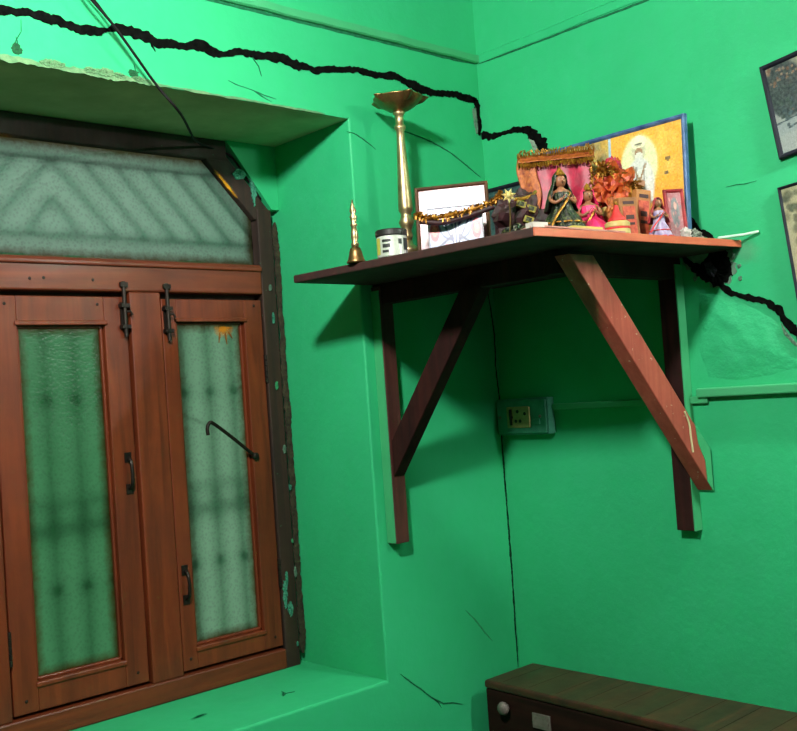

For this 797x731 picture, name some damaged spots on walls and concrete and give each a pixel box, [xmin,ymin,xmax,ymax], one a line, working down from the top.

crack [0,4,548,155]
crack [691,217,714,238]
crack [719,285,797,347]